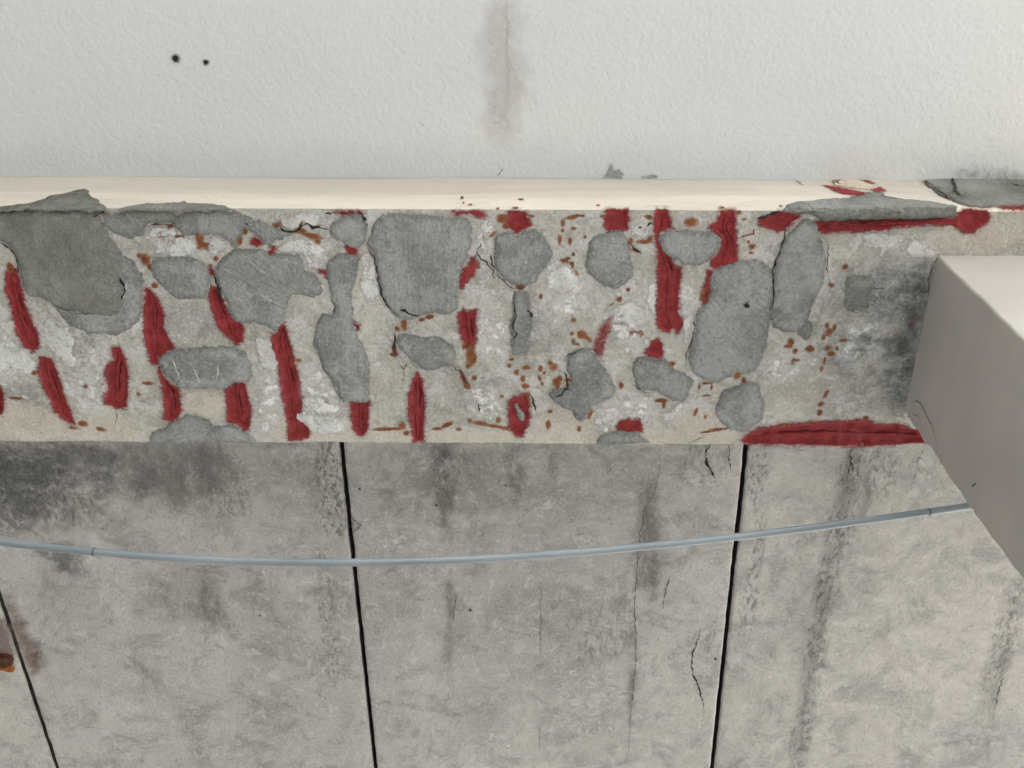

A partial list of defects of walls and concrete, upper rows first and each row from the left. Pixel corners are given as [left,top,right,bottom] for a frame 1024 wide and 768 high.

peeling [277,212,327,268]
crack [274,211,367,233]
peeling [359,251,379,312]
peeling [0,335,36,378]
peeling [256,336,278,371]
corrosion [507,358,571,399]
corrosion [570,314,592,345]
corrosion [784,323,849,371]
leakage [842,323,905,359]
crack [627,446,662,756]
corrosion [0,609,39,673]
crack [690,629,704,707]